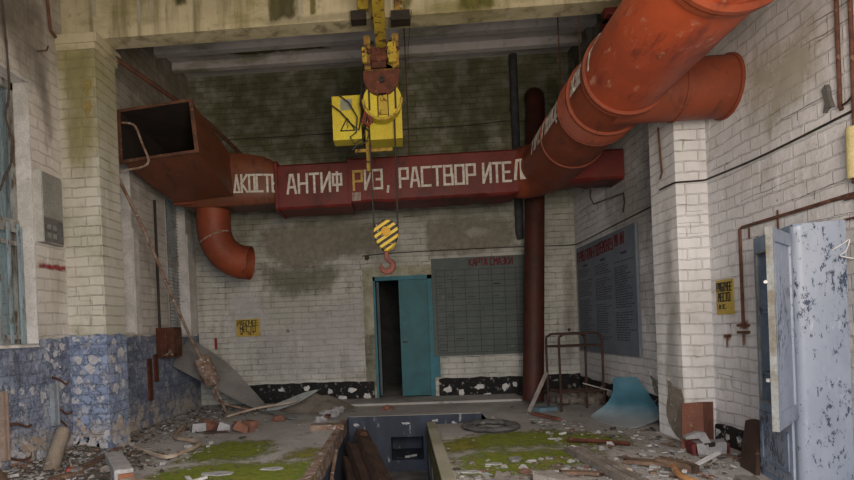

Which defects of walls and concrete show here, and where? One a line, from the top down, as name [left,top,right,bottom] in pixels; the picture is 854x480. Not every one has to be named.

leakage [269,0,320,20]
leakage [67,52,91,162]